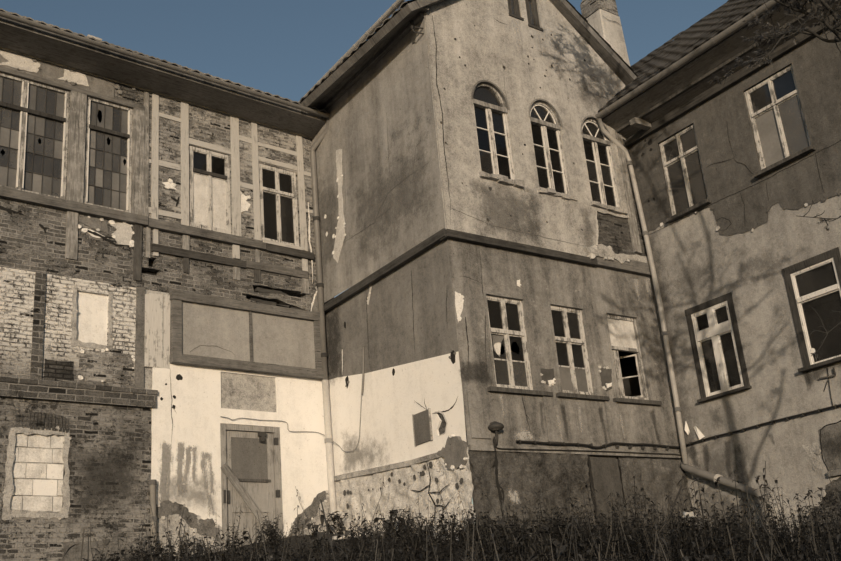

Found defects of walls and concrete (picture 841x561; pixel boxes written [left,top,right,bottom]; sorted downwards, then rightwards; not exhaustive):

peeling [0,50,41,73]
peeling [58,68,89,87]
crack [345,15,590,247]
flaking render [78,216,134,247]
peeling [326,149,346,263]
flaking render [587,141,647,262]
crack [651,126,841,234]
peeling [710,192,841,236]
flaking render [455,291,464,322]
flaking render [156,500,223,561]
flaking render [288,490,332,537]
flaking render [802,423,841,545]